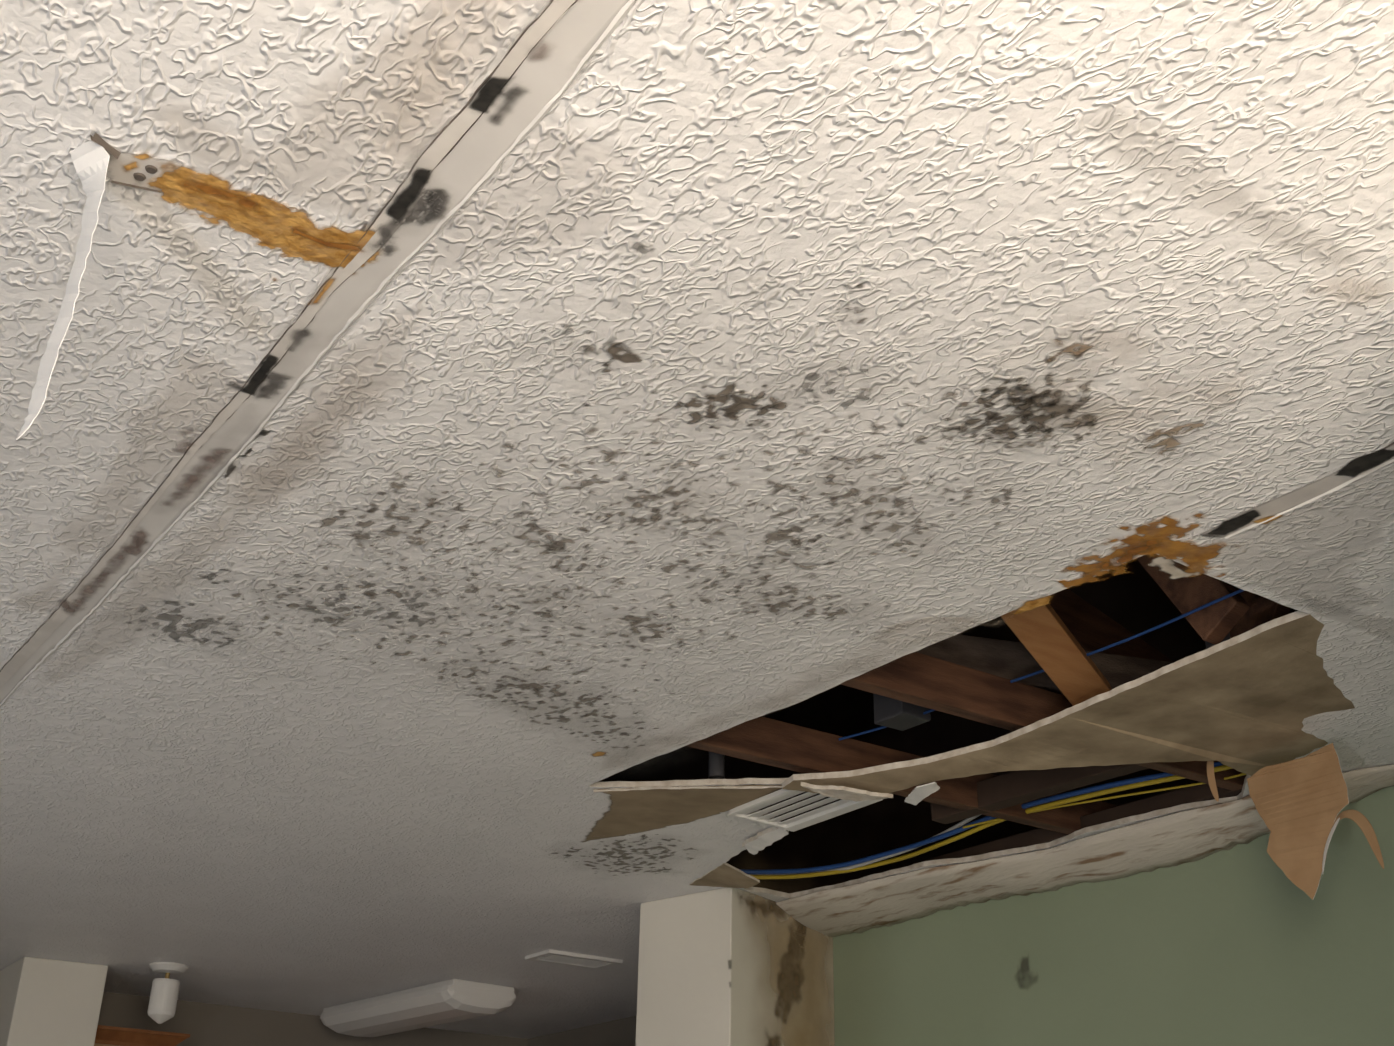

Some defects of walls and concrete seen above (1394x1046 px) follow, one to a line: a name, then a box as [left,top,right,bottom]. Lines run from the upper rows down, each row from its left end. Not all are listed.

peeling [90,132,180,193]
leakage [564,325,642,373]
leakage [231,355,289,398]
mould [253,379,1094,748]
mould [128,601,239,647]
peeling [582,785,782,842]
peeling [904,782,940,805]
leakage [552,834,695,874]
spalling [690,863,760,888]
spalling [742,827,789,855]
spalling [776,795,1271,938]
leakage [747,894,832,1046]